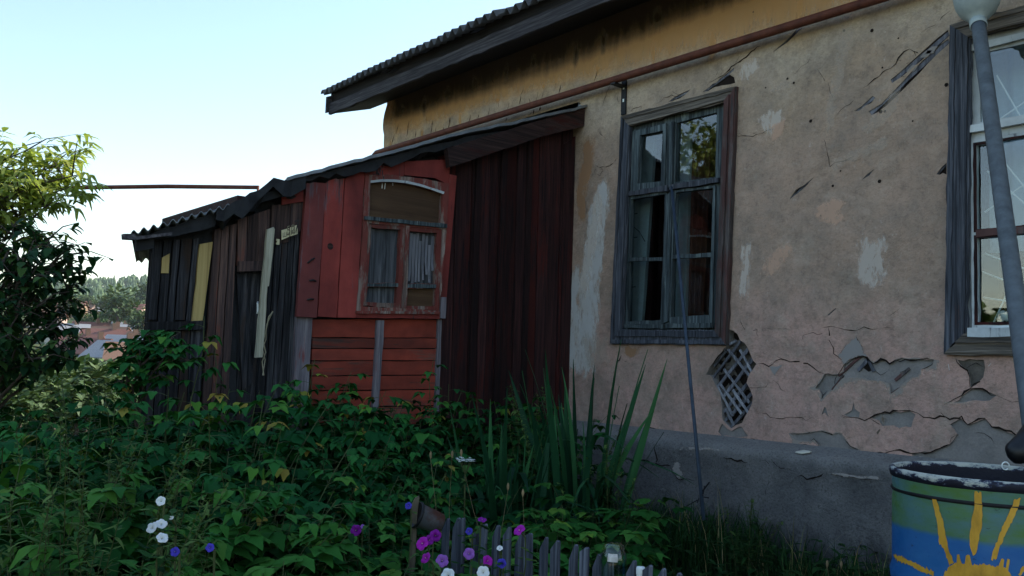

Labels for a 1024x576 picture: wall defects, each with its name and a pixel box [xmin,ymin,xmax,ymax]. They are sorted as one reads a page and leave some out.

leakage [394,0,830,136]
crack [707,45,762,85]
crack [799,13,960,167]
peeling [569,181,609,377]
spalling [706,330,756,437]
spalling [810,337,939,428]
spalling [954,359,996,403]
spalling [789,430,859,454]
spalling [912,418,1024,467]